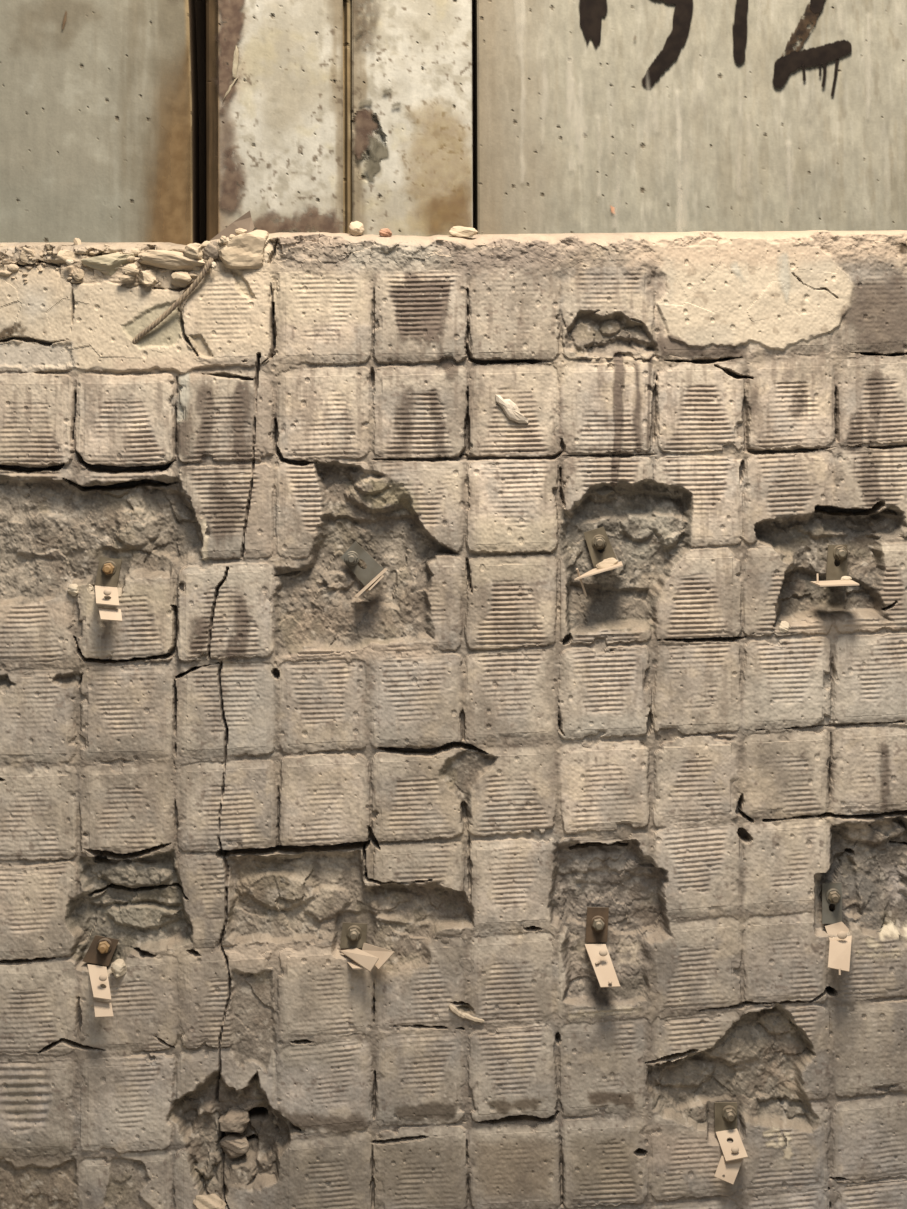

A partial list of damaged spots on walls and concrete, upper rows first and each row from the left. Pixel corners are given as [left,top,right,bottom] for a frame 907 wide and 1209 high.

damp [215,0,245,113]
damp [219,146,244,212]
damp [253,206,341,234]
damp [355,88,401,181]
spalling [0,473,203,607]
spalling [271,459,460,659]
spalling [558,479,694,640]
spalling [754,504,907,630]
crack [207,301,276,1209]
spalling [224,843,476,974]
spalling [546,839,674,1008]
spalling [815,811,907,941]